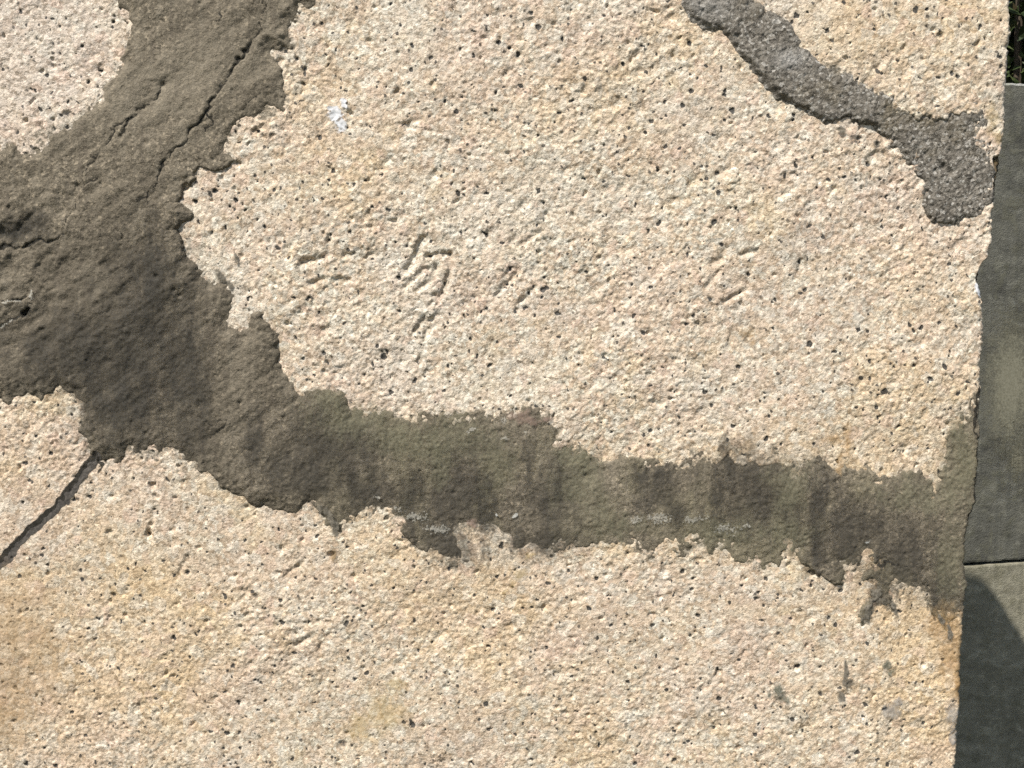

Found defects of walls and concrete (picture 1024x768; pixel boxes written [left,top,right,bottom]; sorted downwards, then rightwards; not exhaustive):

crack [129,0,267,204]
crack [0,451,104,569]
leakage [394,469,498,556]
leakage [628,471,707,524]